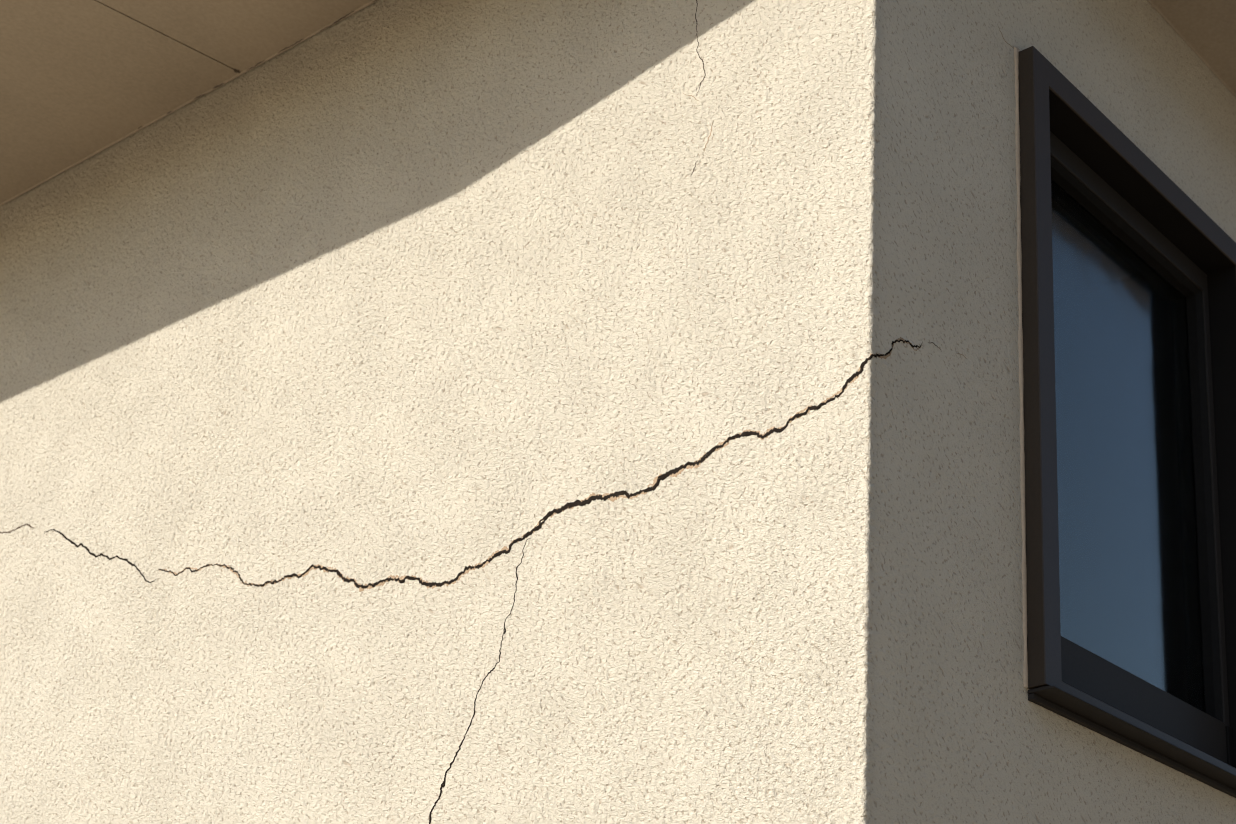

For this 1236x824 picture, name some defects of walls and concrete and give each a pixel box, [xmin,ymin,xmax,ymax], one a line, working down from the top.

crack [0,337,966,824]